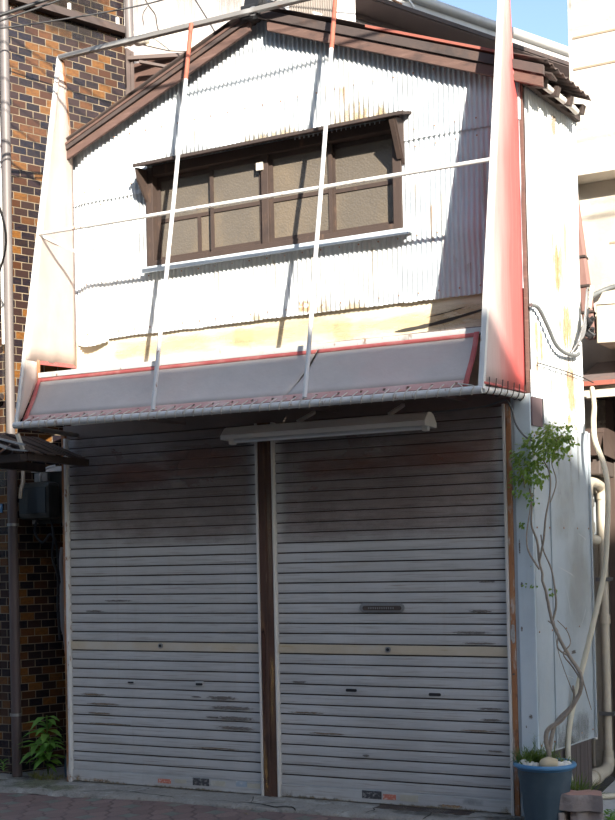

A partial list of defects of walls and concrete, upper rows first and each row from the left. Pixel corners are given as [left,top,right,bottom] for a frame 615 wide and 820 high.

rust [552,222,566,290]
rust [560,301,571,346]
rust [566,367,578,431]